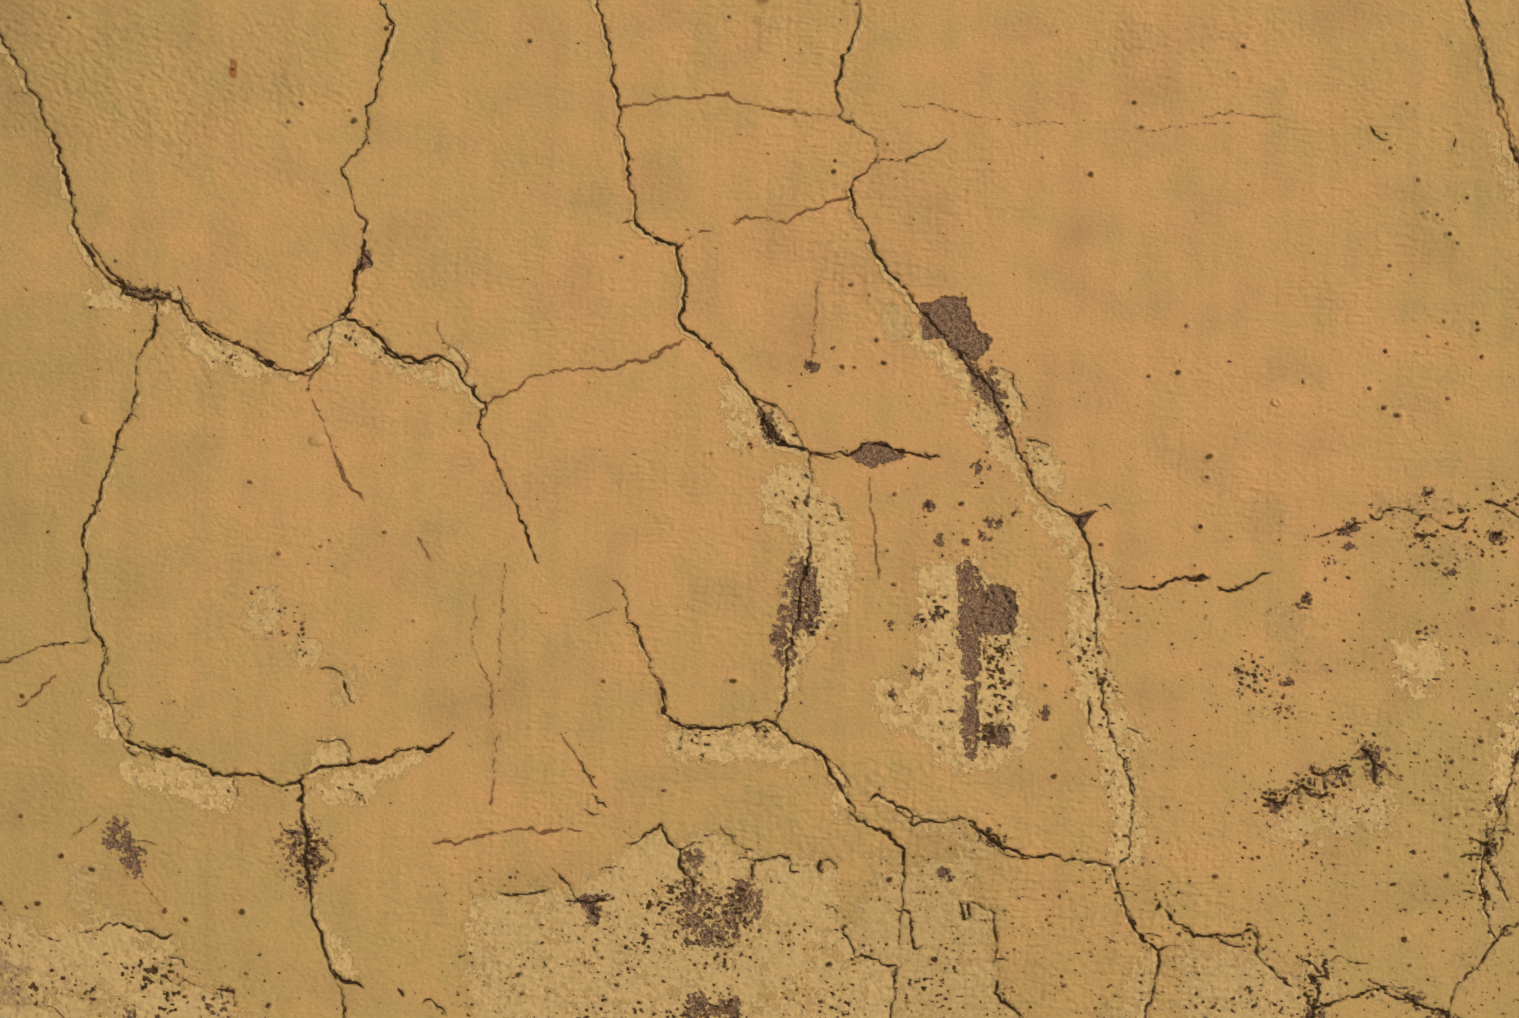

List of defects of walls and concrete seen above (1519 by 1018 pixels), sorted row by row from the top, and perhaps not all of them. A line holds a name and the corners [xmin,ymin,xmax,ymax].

crack [1458,0,1519,176]
crack [0,0,1176,1018]
peeling [660,377,857,823]
peeling [871,293,1172,868]
crack [1121,572,1270,592]
crack [1308,500,1519,536]
peeling [1322,480,1519,582]
peeling [0,816,247,1018]
peeling [462,809,1023,1018]
crack [1156,901,1292,987]
peeling [1245,712,1424,849]
crack [1297,741,1519,1018]